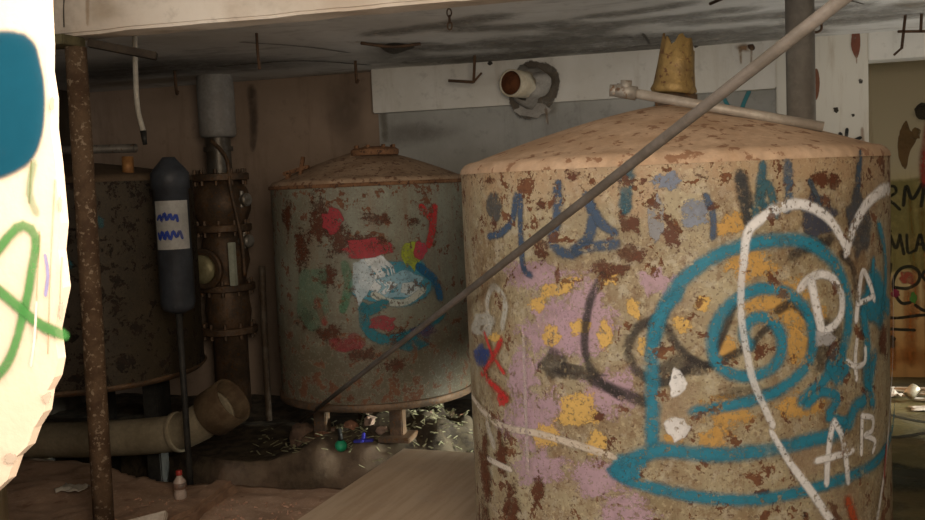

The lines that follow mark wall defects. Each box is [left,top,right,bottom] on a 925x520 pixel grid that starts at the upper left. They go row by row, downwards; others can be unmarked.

rust [806,169,842,190]
rust [281,188,393,294]
rust [531,239,550,263]
rust [591,211,648,280]
rust [660,214,681,252]
rust [476,425,524,520]
rust [530,470,545,507]